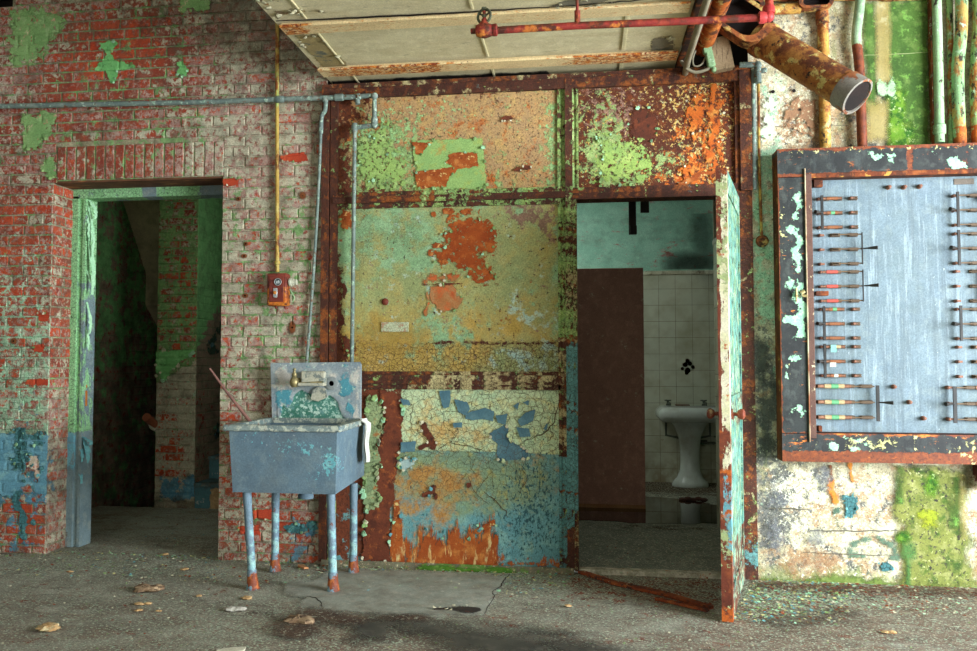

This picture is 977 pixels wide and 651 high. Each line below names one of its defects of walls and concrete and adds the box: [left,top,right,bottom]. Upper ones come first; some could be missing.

peeling [95,39,135,84]
peeling [356,120,489,192]
rust [627,106,661,143]
rust [677,84,729,185]
rust [428,206,502,287]
crack [359,340,582,517]
peeling [439,390,535,463]
peeling [0,427,48,540]
rust [827,465,839,504]
peeling [841,492,859,518]
peeling [734,561,977,625]
water stain [272,610,620,651]